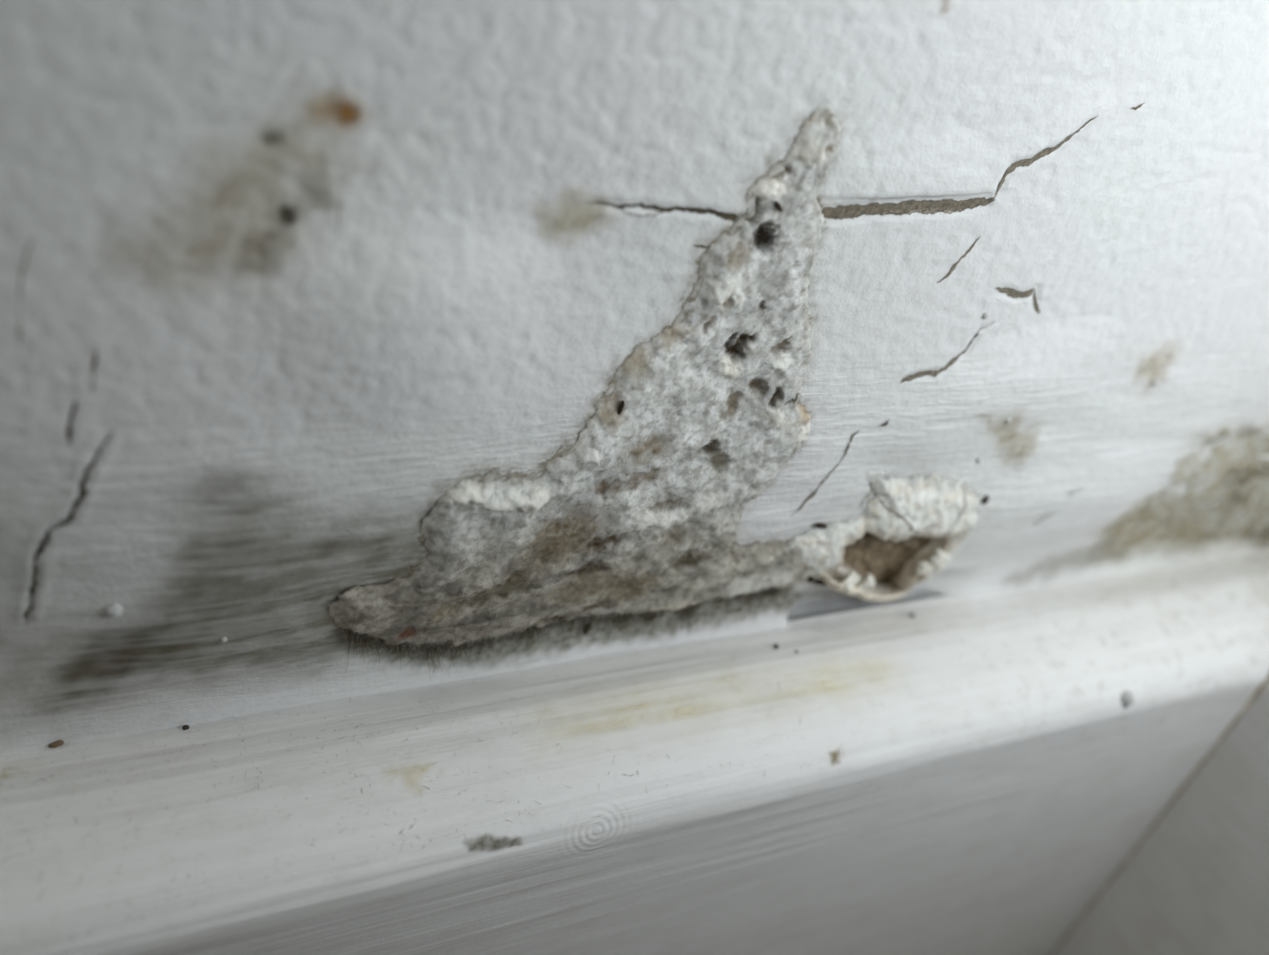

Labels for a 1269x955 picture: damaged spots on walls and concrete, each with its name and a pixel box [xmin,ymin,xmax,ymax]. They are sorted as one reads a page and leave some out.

crack [822,116,1097,282]
flaking render [323,83,1128,674]
crack [901,287,1040,382]
crack [24,347,111,624]
crack [796,420,889,512]
peeling [1141,429,1269,541]